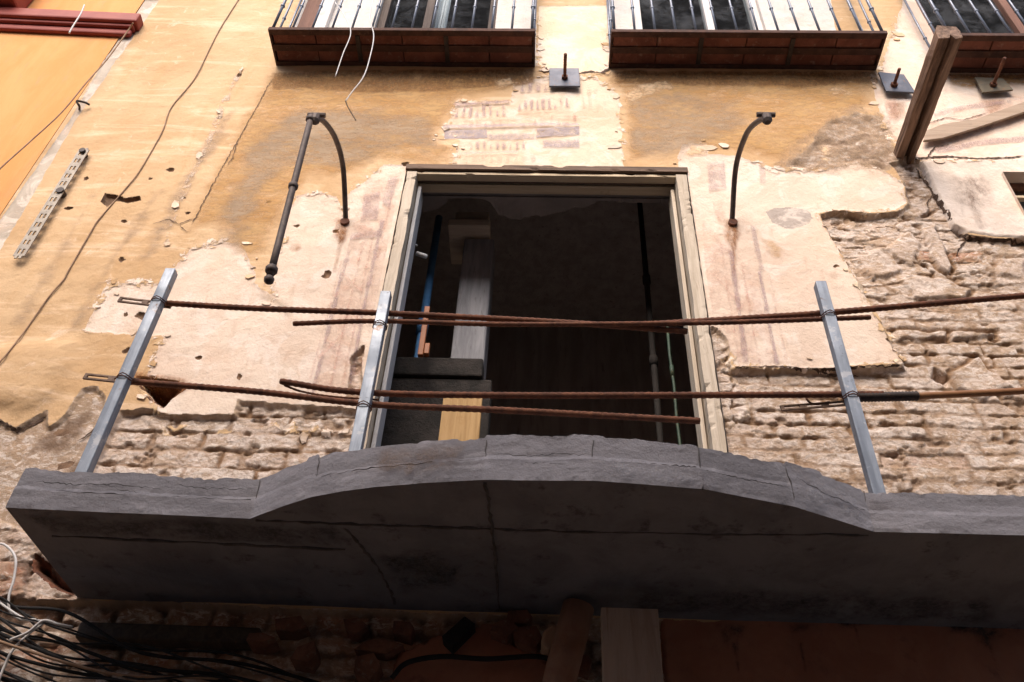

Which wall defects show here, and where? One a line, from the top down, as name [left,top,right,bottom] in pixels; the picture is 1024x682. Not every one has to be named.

flaking render [82,0,1024,496]
flaking render [0,386,106,531]
spalling [32,553,74,596]